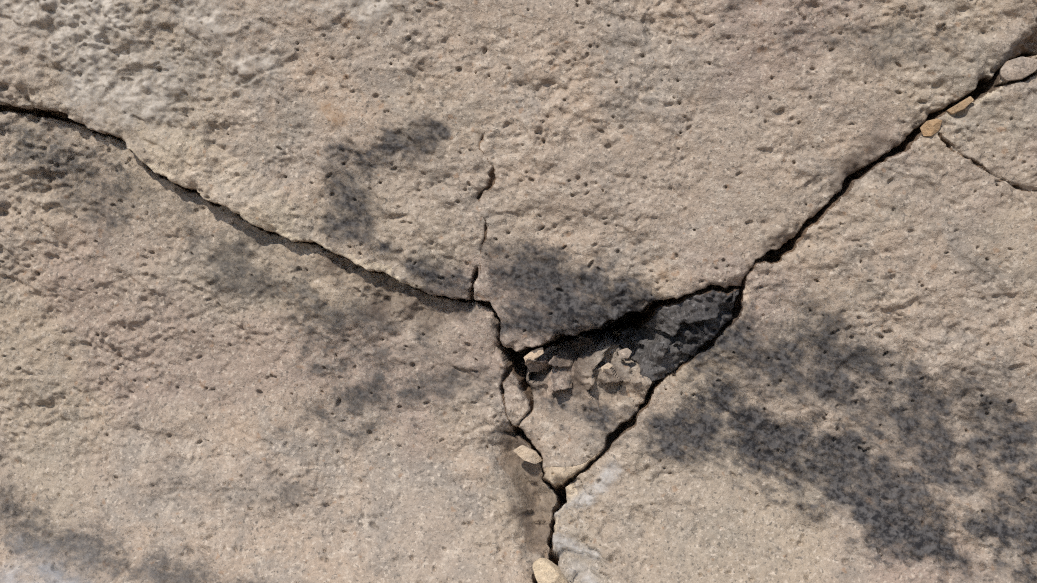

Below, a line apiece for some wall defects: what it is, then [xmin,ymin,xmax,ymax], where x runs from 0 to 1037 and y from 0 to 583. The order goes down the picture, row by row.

crack [1014,52,1037,60]
crack [0,104,426,292]
crack [432,67,1037,566]
water stain [647,391,967,575]
water stain [996,546,1037,583]